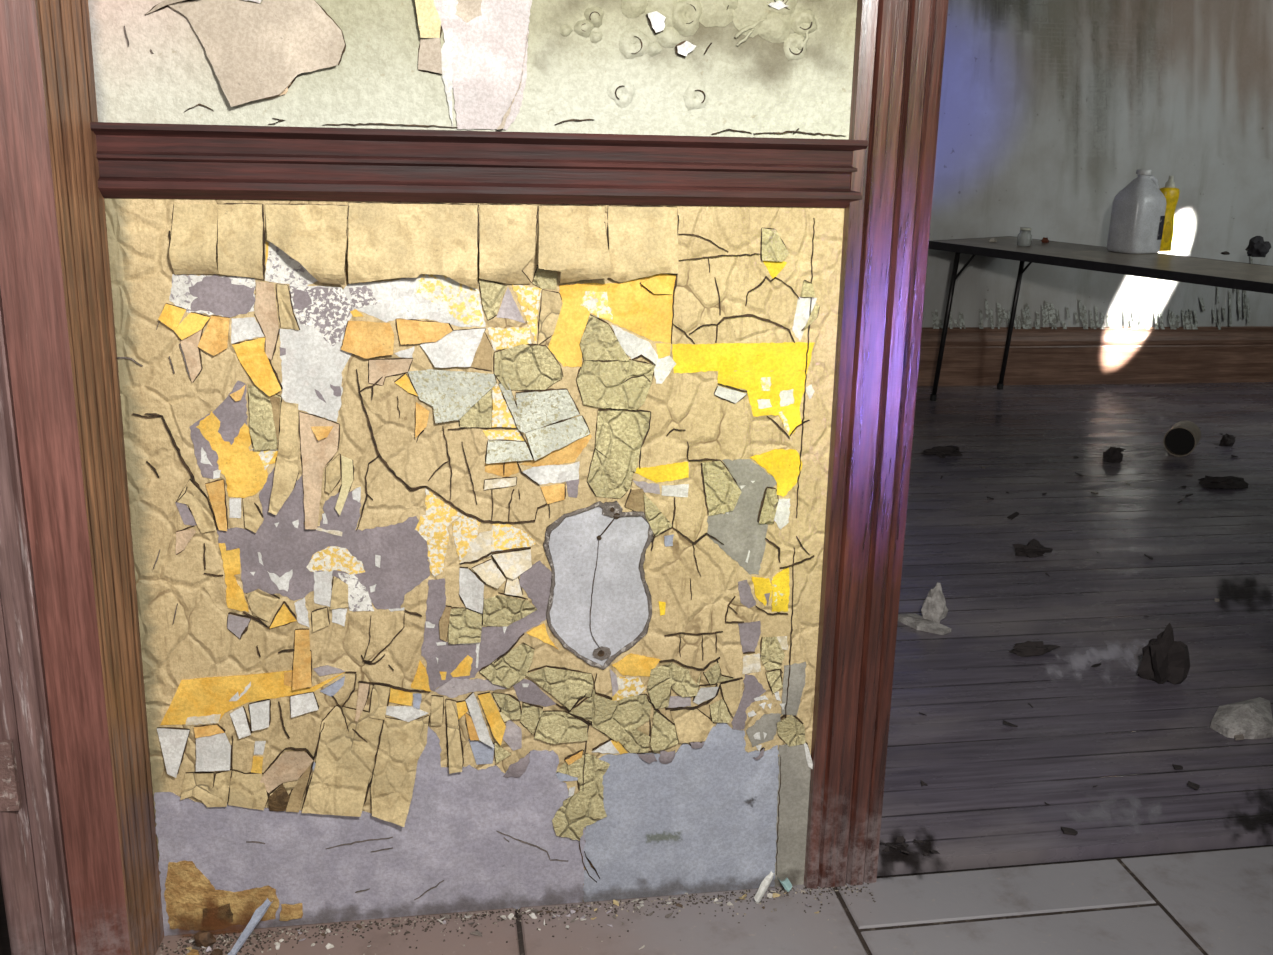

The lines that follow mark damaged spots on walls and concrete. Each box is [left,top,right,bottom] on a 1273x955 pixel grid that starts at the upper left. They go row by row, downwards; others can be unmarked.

peeling [145,0,346,107]
peeling [414,0,532,131]
crack [474,204,482,275]
peeling [931,287,1250,329]
crack [356,369,550,584]
crack [584,215,815,743]
peeling [154,202,820,953]
crack [484,633,524,669]
crack [531,673,613,786]
crack [774,756,782,875]